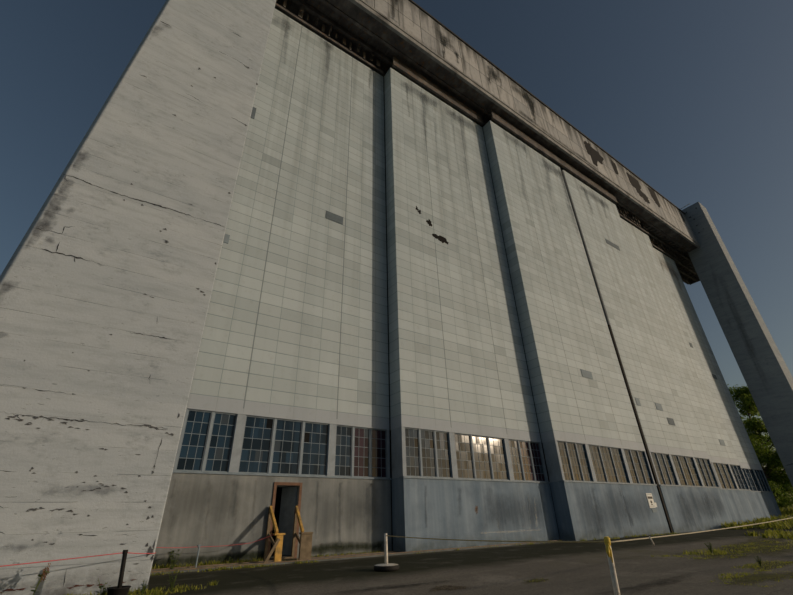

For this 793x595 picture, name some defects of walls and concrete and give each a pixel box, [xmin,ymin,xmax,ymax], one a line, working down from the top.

crack [64,174,221,226]
peeling [584,141,660,208]
crack [36,226,101,265]
crack [12,413,168,463]